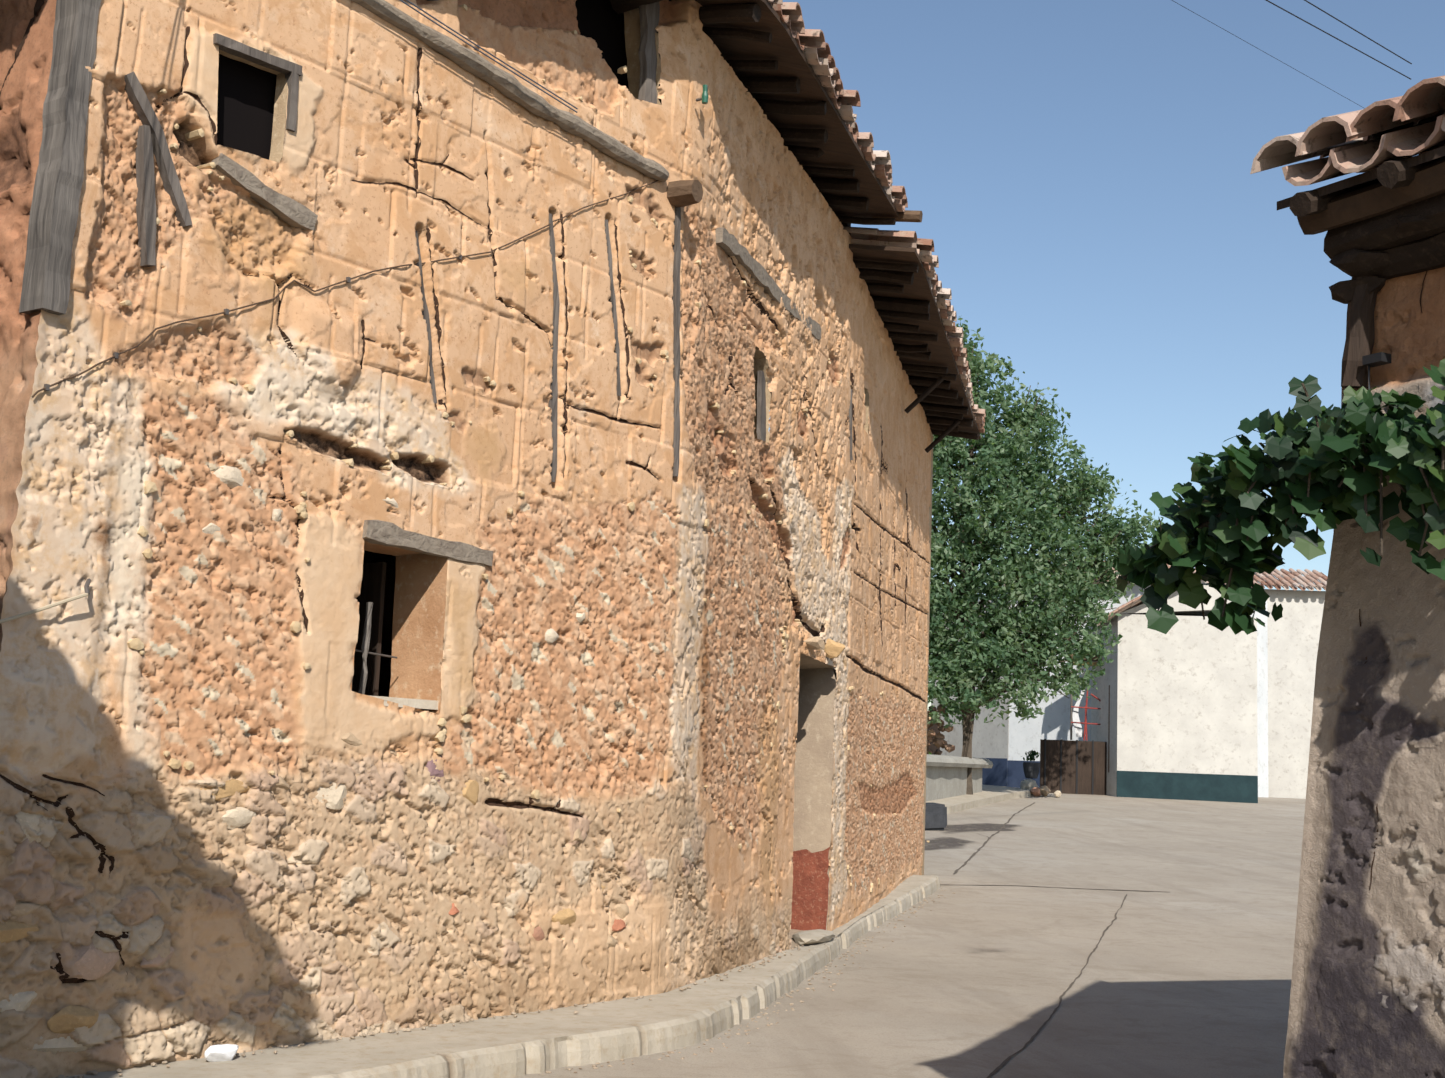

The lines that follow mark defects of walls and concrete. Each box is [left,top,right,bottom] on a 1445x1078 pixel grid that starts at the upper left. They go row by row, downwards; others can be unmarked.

crack [0,0,44,110]
flaking render [82,71,255,325]
flaking render [436,406,472,434]
flaking render [461,365,498,397]
crack [681,255,929,702]
peeling [120,318,452,789]
flaking render [839,521,852,572]
peeling [694,395,803,855]
crack [0,774,115,876]
crack [485,797,583,818]